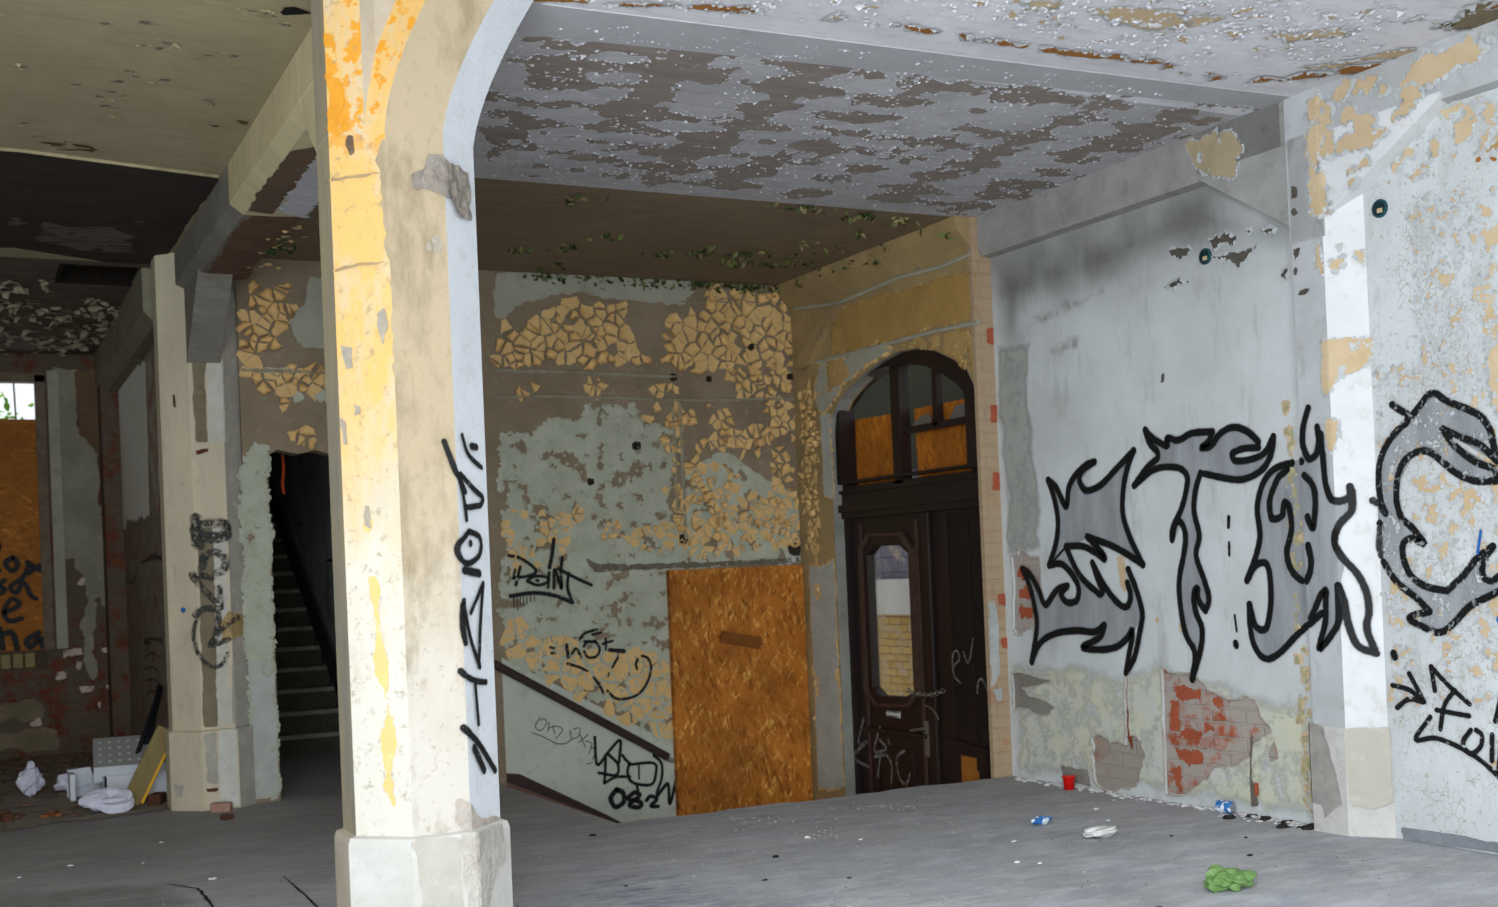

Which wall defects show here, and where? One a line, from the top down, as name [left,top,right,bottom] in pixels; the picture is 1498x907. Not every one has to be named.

peeling [476,26,1261,216]
flaking render [0,699,60,753]
flaking render [0,280,120,680]
crack [165,883,213,907]
flaking render [118,156,353,736]
peeling [198,442,283,806]
crack [284,876,318,907]
peeling [368,139,505,907]
peeling [489,270,994,792]
peeling [641,0,1498,718]
flaking render [1061,667,1279,797]
peeling [1293,593,1393,819]